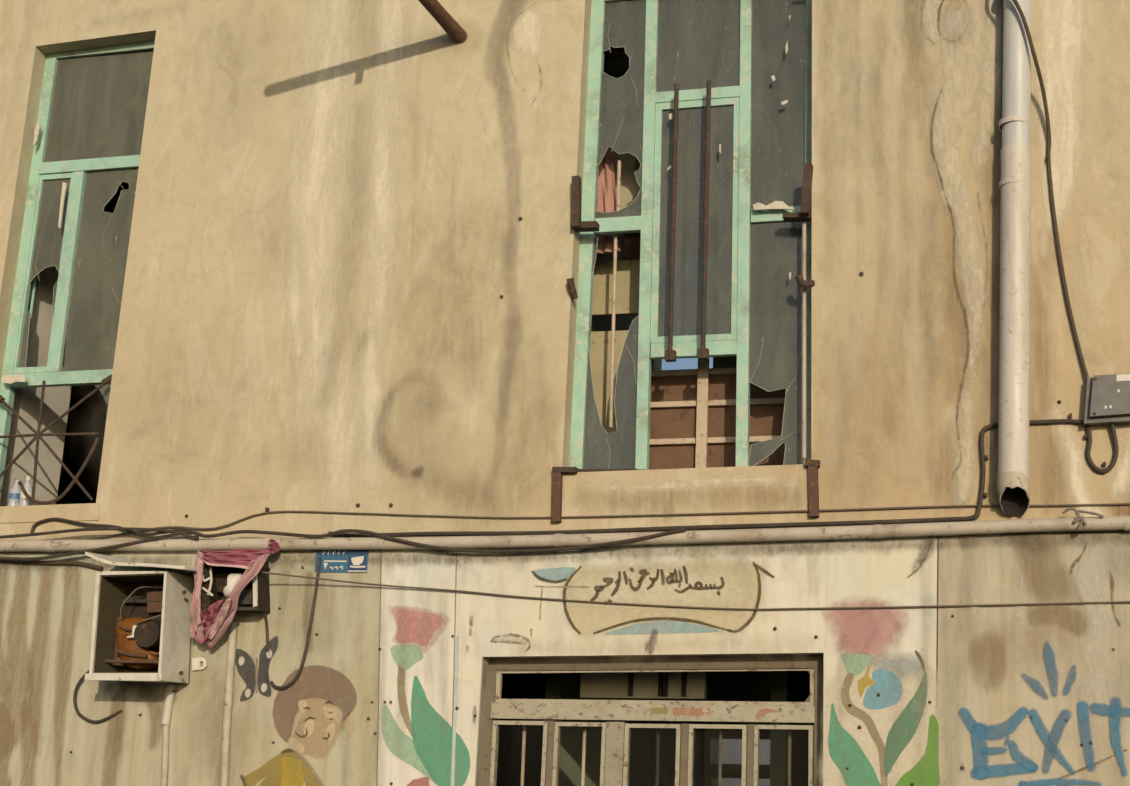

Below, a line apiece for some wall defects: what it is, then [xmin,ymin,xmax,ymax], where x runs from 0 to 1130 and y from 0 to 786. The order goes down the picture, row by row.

crack [507,10,542,100]